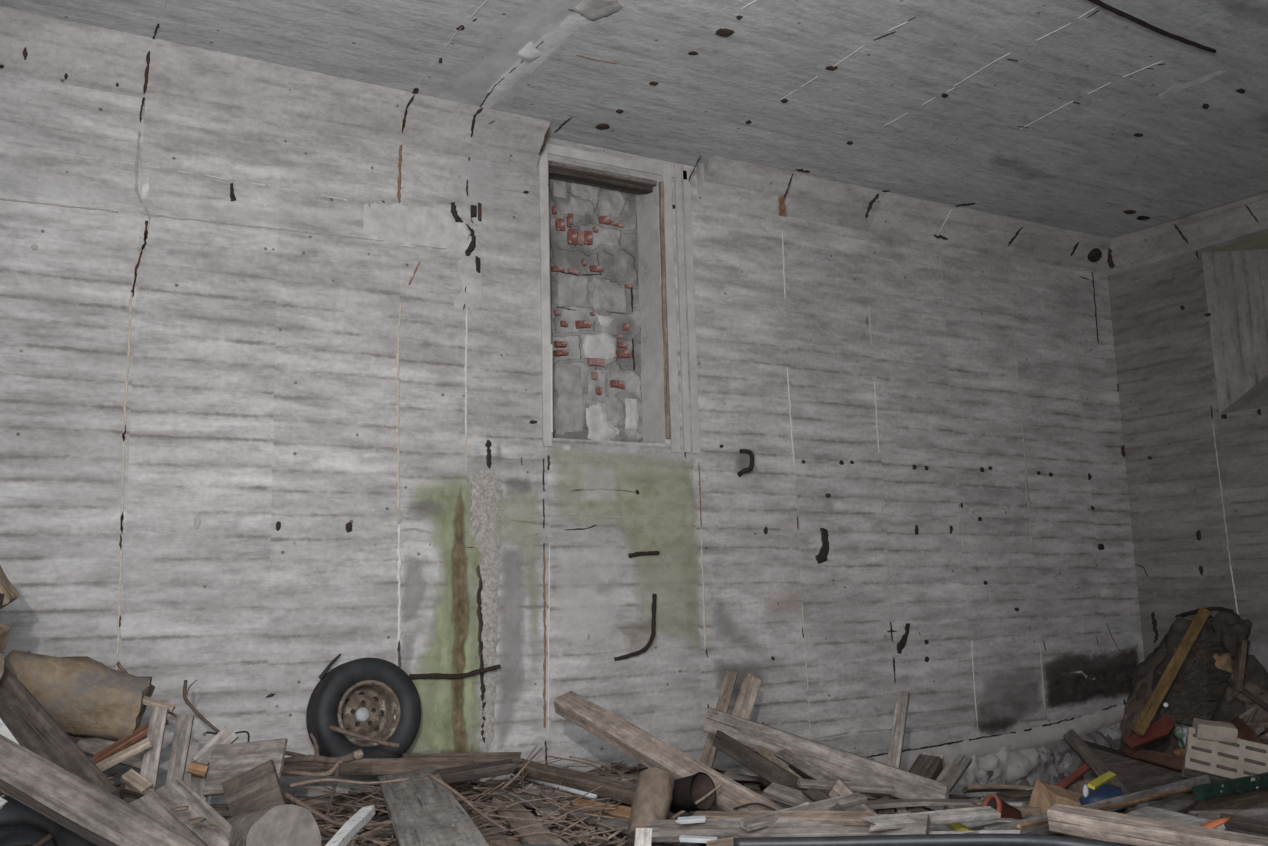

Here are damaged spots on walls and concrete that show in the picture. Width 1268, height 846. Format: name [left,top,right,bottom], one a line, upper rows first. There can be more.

crack [465,41,544,223]
crack [0,0,487,671]
corrosion [445,496,479,753]
water stain [499,552,521,736]
crack [463,284,708,765]
water stain [979,649,1138,732]